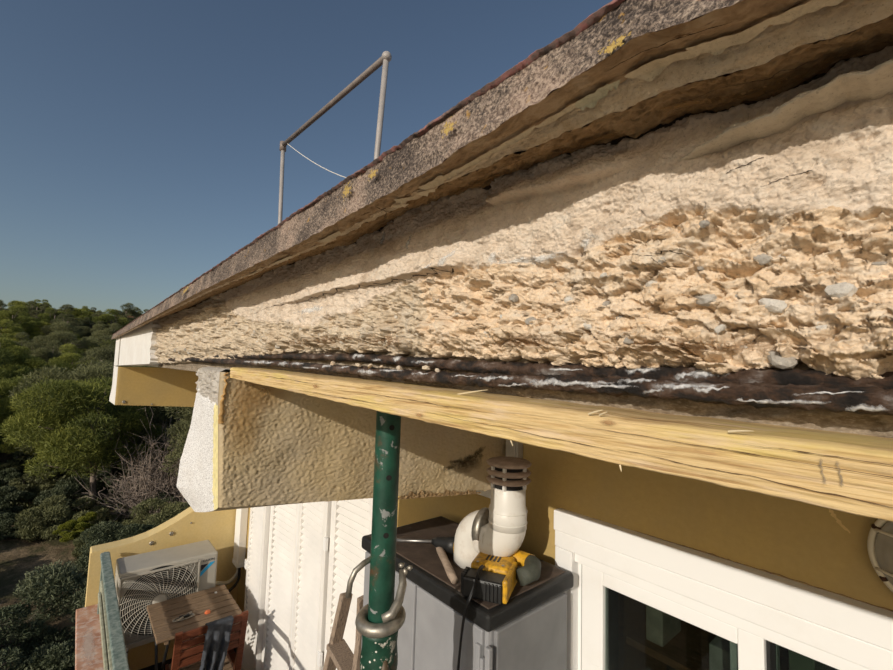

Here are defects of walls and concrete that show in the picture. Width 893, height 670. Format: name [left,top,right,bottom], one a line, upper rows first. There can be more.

peeling [393,0,844,208]
crack [597,55,866,146]
crack [254,267,454,314]
leakage [342,354,402,374]
efflorescence [480,368,727,393]
efflorescence [738,391,859,404]